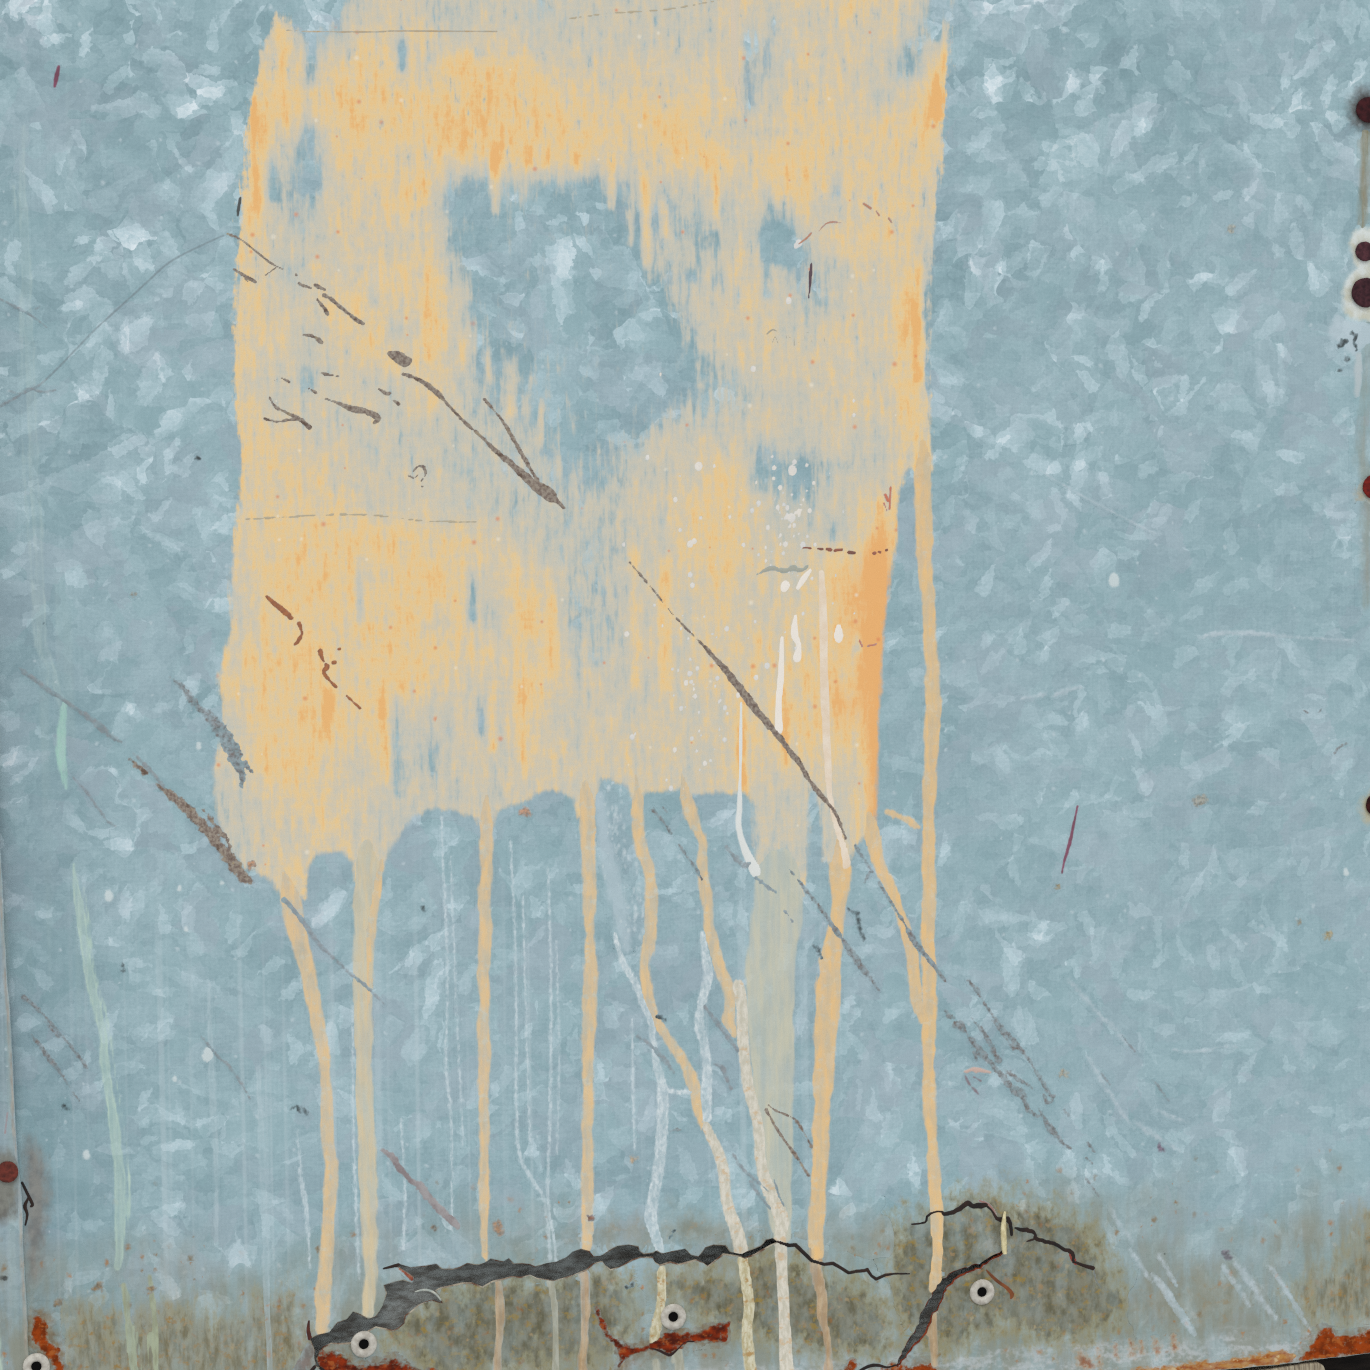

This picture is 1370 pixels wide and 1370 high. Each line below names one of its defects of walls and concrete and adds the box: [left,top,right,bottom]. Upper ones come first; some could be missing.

leakage [16,1127,337,1370]
crack [306,1199,1101,1370]
leakage [365,1164,1370,1370]
rust [26,1295,69,1370]
rust [293,1342,439,1370]
rust [594,1306,731,1370]
rust [836,1349,951,1370]
rust [1070,1322,1370,1370]